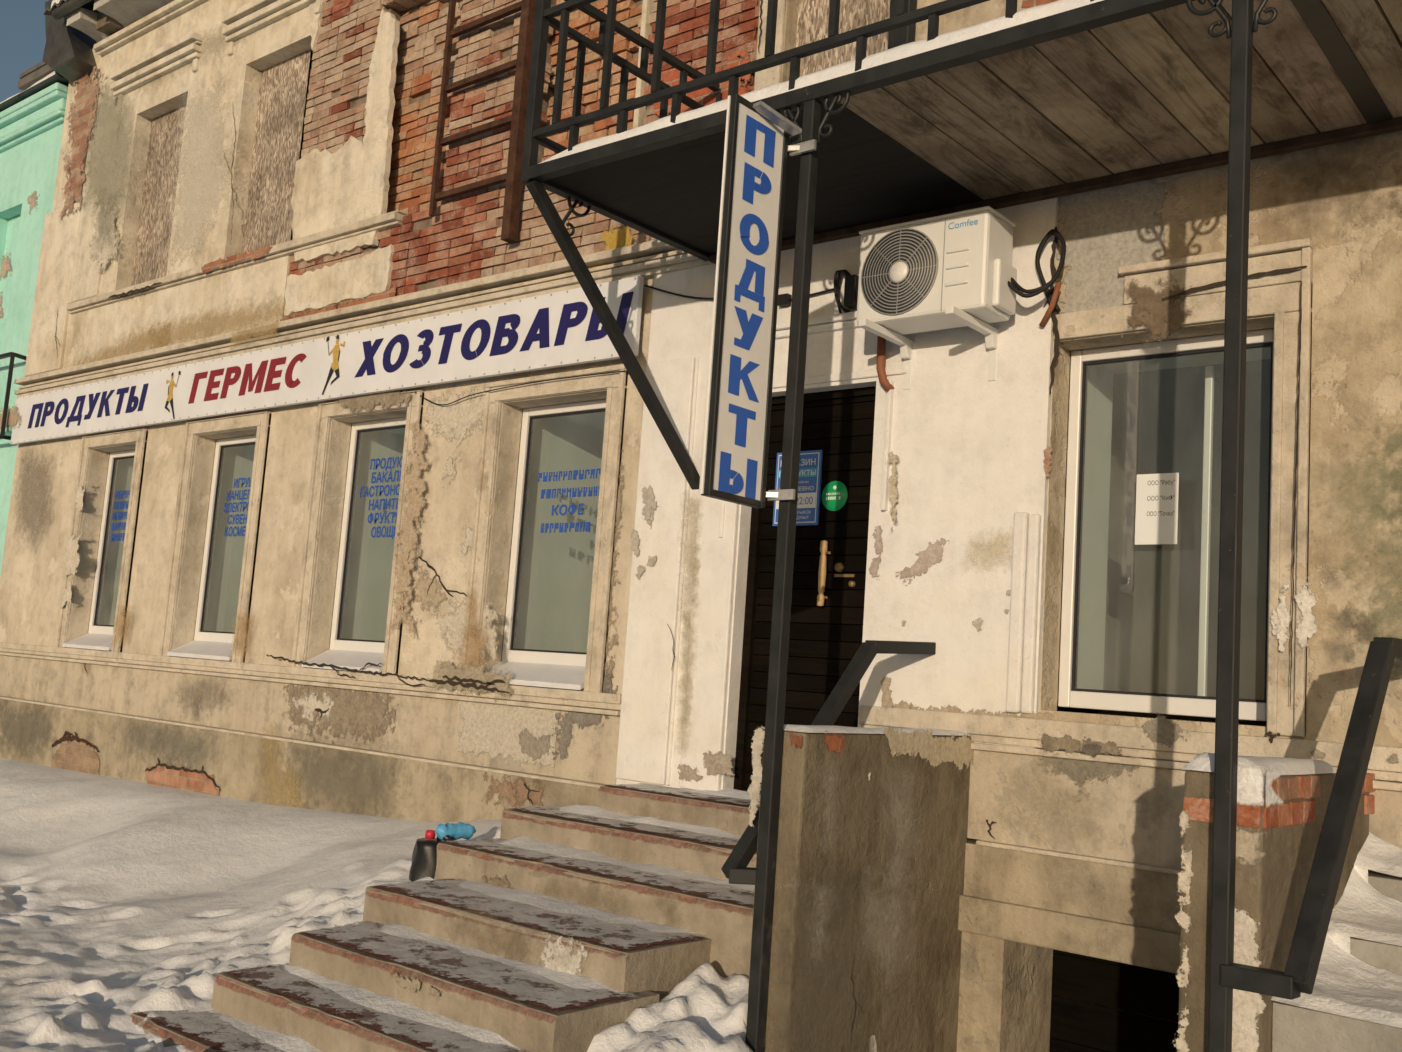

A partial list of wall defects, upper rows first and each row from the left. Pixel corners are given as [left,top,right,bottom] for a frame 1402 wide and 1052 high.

flaking render [653,50,751,116]
flaking render [276,285,399,332]
peeling [869,451,899,577]
crack [419,556,467,597]
peeling [896,538,949,586]
spalling [283,681,398,744]
spalling [881,676,1122,758]
flaking render [884,726,975,773]
flaking render [1236,776,1321,865]
flaking render [1173,797,1214,1052]
flaking render [1234,908,1262,967]
flaking render [1232,989,1266,1052]